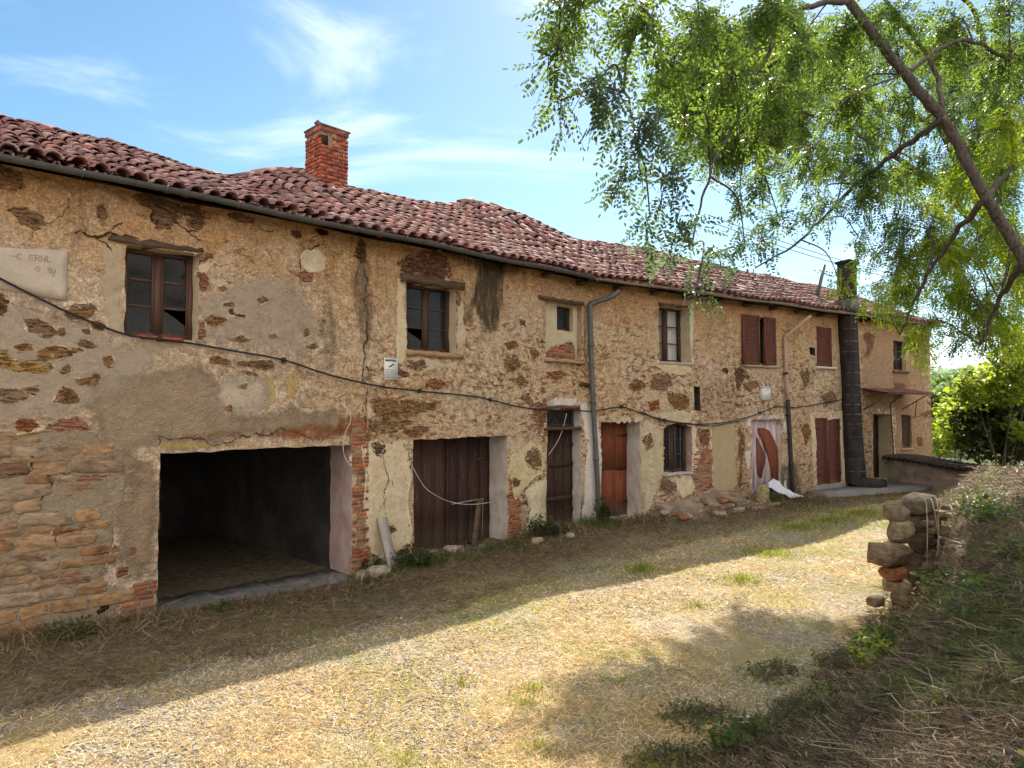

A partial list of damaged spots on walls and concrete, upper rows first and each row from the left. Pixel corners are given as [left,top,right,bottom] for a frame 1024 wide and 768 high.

crack [74,203,205,250]
spalling [128,193,212,234]
spalling [397,249,453,279]
damp [437,250,518,333]
spalling [0,301,116,405]
crack [356,242,394,525]
flaking render [502,340,576,433]
spalling [629,372,691,413]
flaking render [0,416,158,638]
crack [150,427,341,446]
flaking render [506,446,543,540]
flaking render [687,428,714,492]